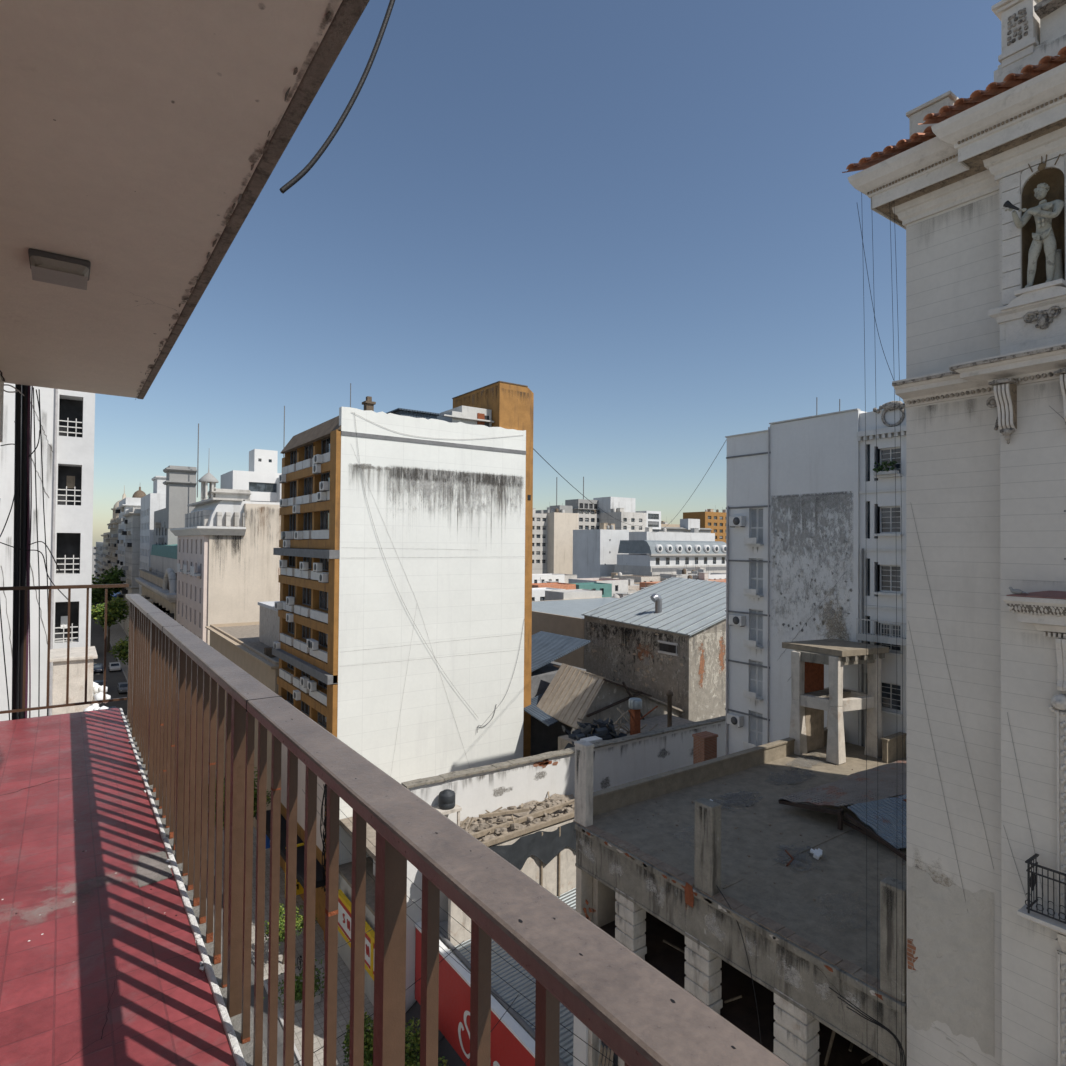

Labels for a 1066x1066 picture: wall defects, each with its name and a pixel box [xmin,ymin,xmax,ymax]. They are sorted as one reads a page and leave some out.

leakage [772,491,852,618]
peeling [586,622,726,701]
spalling [907,938,918,970]